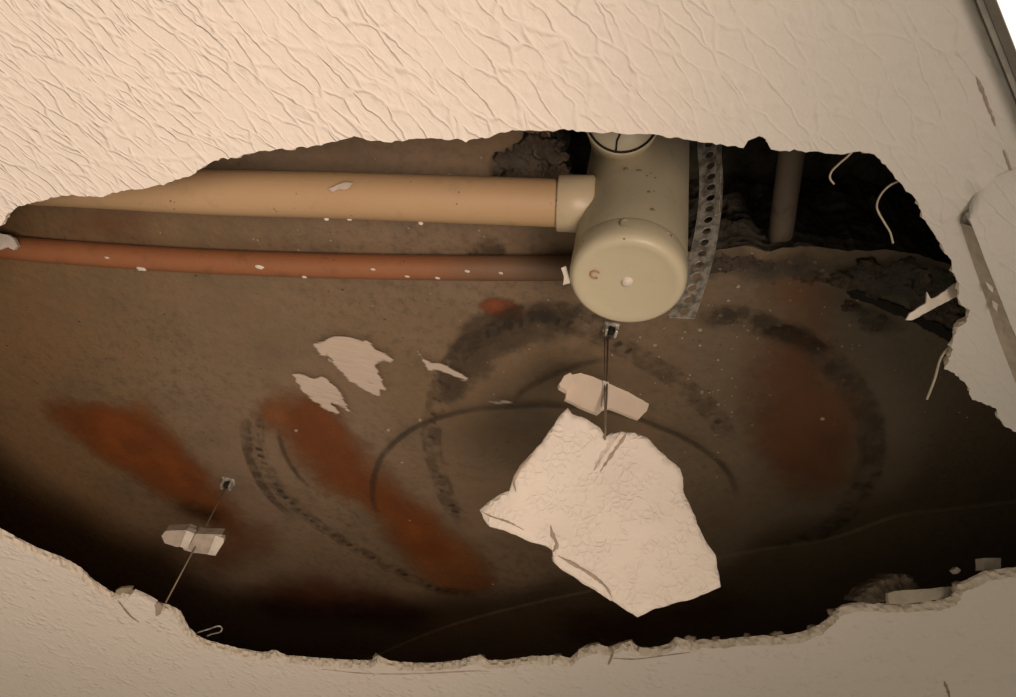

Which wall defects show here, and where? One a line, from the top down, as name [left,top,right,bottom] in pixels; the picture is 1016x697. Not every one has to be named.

spalling [492,129,591,179]
flaking render [0,211,21,250]
spalling [688,136,970,374]
corrosion [262,399,492,592]
flaking render [0,528,134,600]
flaking render [159,567,1016,671]